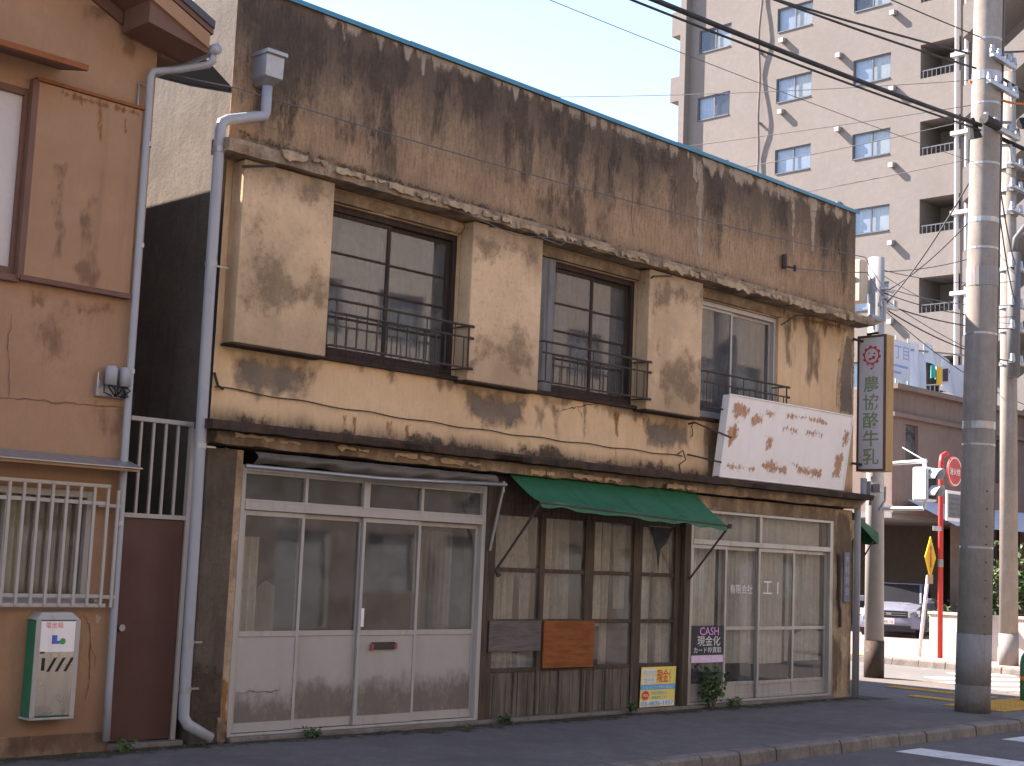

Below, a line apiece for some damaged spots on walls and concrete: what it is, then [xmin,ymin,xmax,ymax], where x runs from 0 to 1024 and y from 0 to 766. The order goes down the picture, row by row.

damp [325,15,850,276]
spalling [282,150,649,264]
crack [7,314,122,408]
damp [235,358,313,396]
damp [662,359,700,402]
damp [783,309,827,380]
damp [467,391,526,427]
flaking render [393,453,481,467]
flaking render [530,469,555,477]
flaking render [573,473,621,484]
flaking render [667,483,697,491]
crack [83,616,96,699]